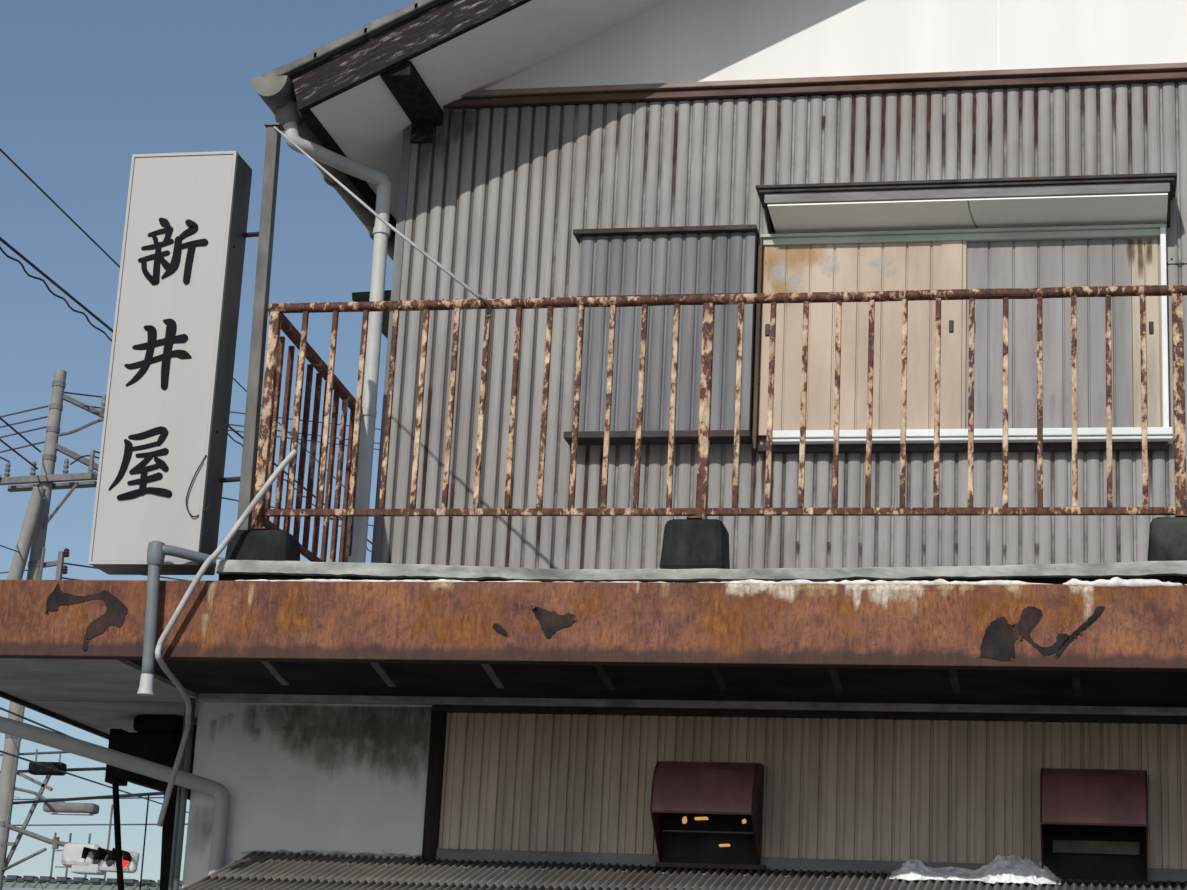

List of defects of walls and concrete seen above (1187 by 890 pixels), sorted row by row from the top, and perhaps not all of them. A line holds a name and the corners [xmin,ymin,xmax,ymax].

corrosion [419,388,432,535]
corrosion [581,449,603,549]
corrosion [752,442,774,528]
peeling [45,583,128,651]
peeling [492,623,509,637]
peeling [531,605,576,639]
peeling [980,606,1105,661]